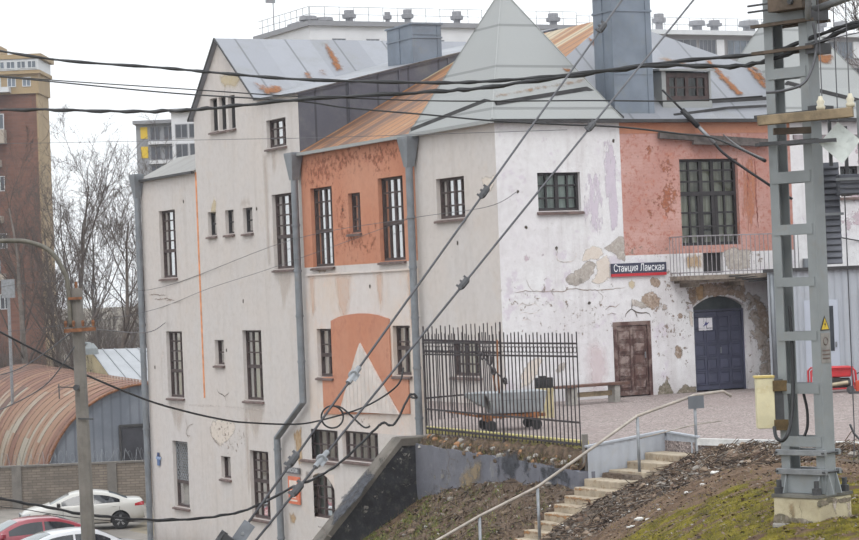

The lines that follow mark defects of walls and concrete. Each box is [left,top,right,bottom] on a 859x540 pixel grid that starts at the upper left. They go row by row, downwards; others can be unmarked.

corrosion [326,45,342,69]
corrosion [256,83,282,94]
corrosion [707,60,743,94]
corrosion [747,67,766,87]
flaking render [647,147,678,226]
peeling [744,160,758,229]
spalling [566,139,668,291]
crack [517,280,650,321]
spalling [632,271,771,382]
spalling [521,358,543,386]
spalling [658,368,696,395]